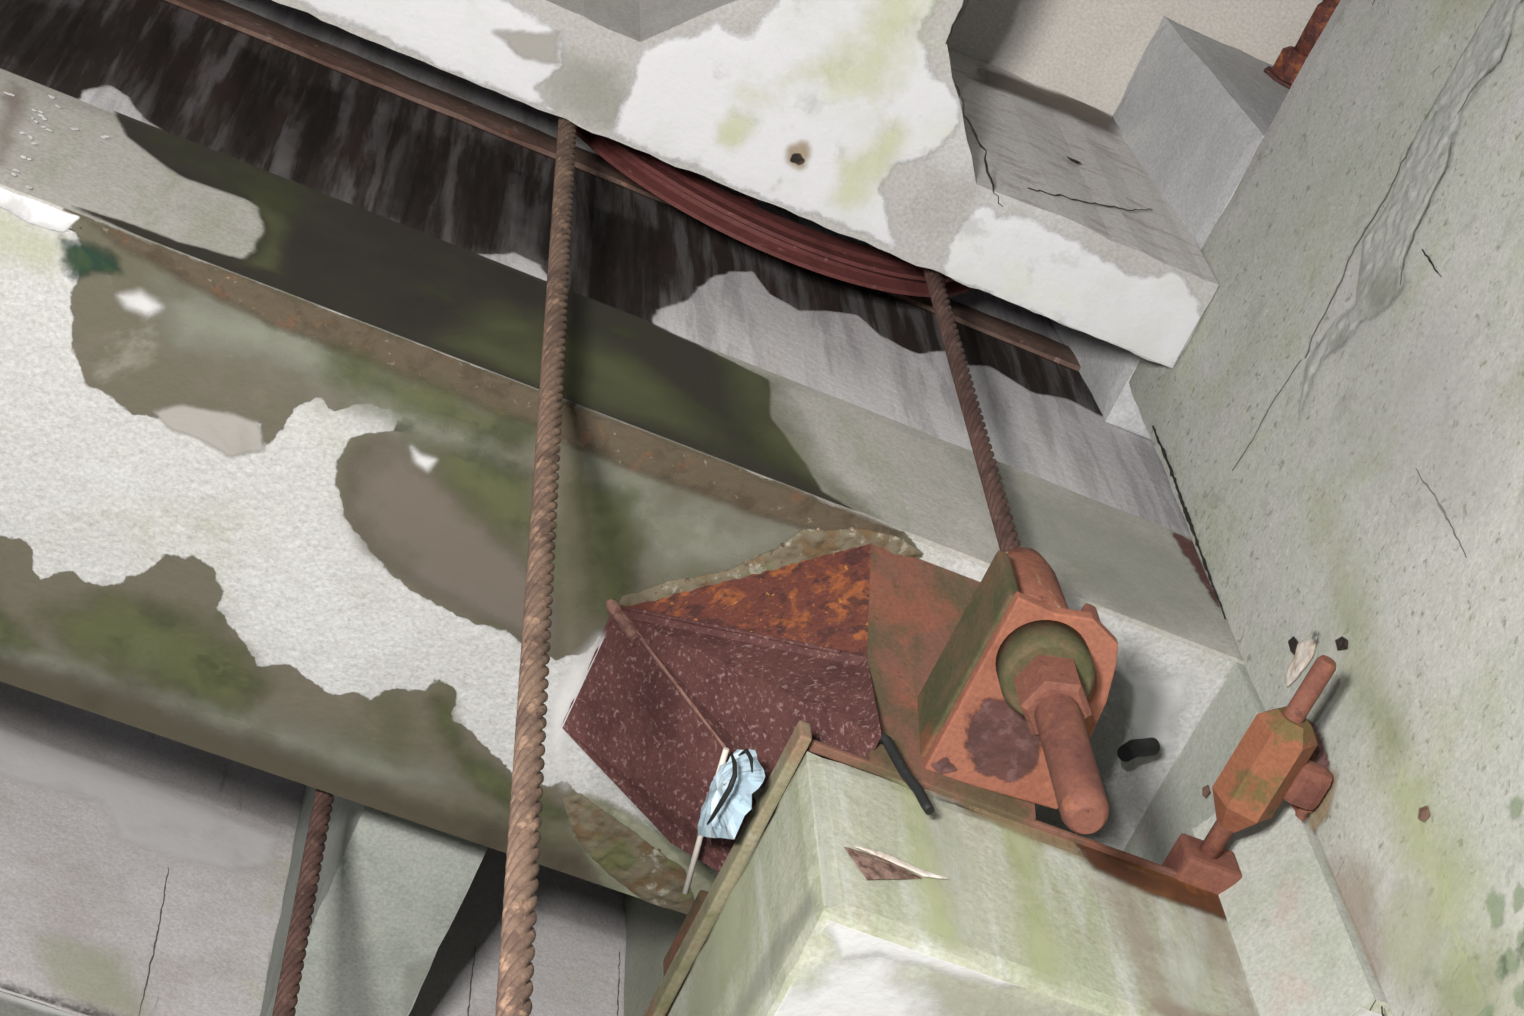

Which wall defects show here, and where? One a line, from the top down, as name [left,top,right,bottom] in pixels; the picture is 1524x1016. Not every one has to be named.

flaking render [299,0,563,112]
flaking render [614,0,960,249]
water stain [980,69,1115,132]
peeling [0,187,80,232]
water stain [0,0,556,642]
water stain [560,167,1103,509]
flaking render [941,206,1202,368]
water stain [888,527,922,559]
water stain [0,536,512,853]
water stain [536,437,808,885]
peeling [0,724,277,868]
water stain [0,987,101,1016]